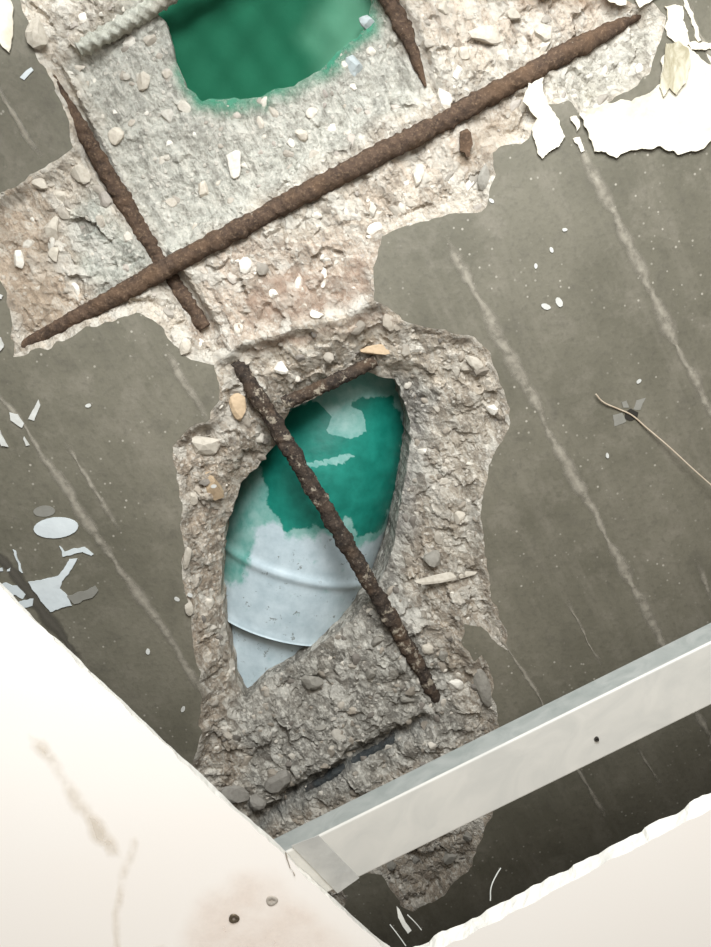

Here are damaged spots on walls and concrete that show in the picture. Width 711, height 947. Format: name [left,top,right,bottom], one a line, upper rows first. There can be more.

spalling [0,0,711,365]
rust [459,129,473,158]
spalling [173,300,510,839]
spalling [327,889,347,907]
spalling [368,811,493,912]